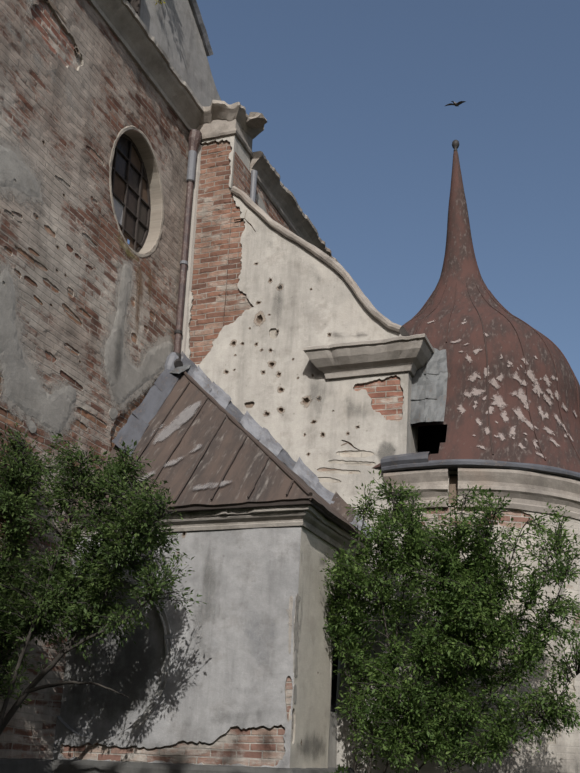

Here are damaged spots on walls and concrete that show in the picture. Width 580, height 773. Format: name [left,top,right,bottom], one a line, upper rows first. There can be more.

spalling [30,0,84,71]
spalling [33,213,93,270]
flaking render [188,139,261,364]
spalling [254,328,285,393]
flaking render [353,375,404,421]
peeling [457,354,577,458]
spalling [60,594,302,767]